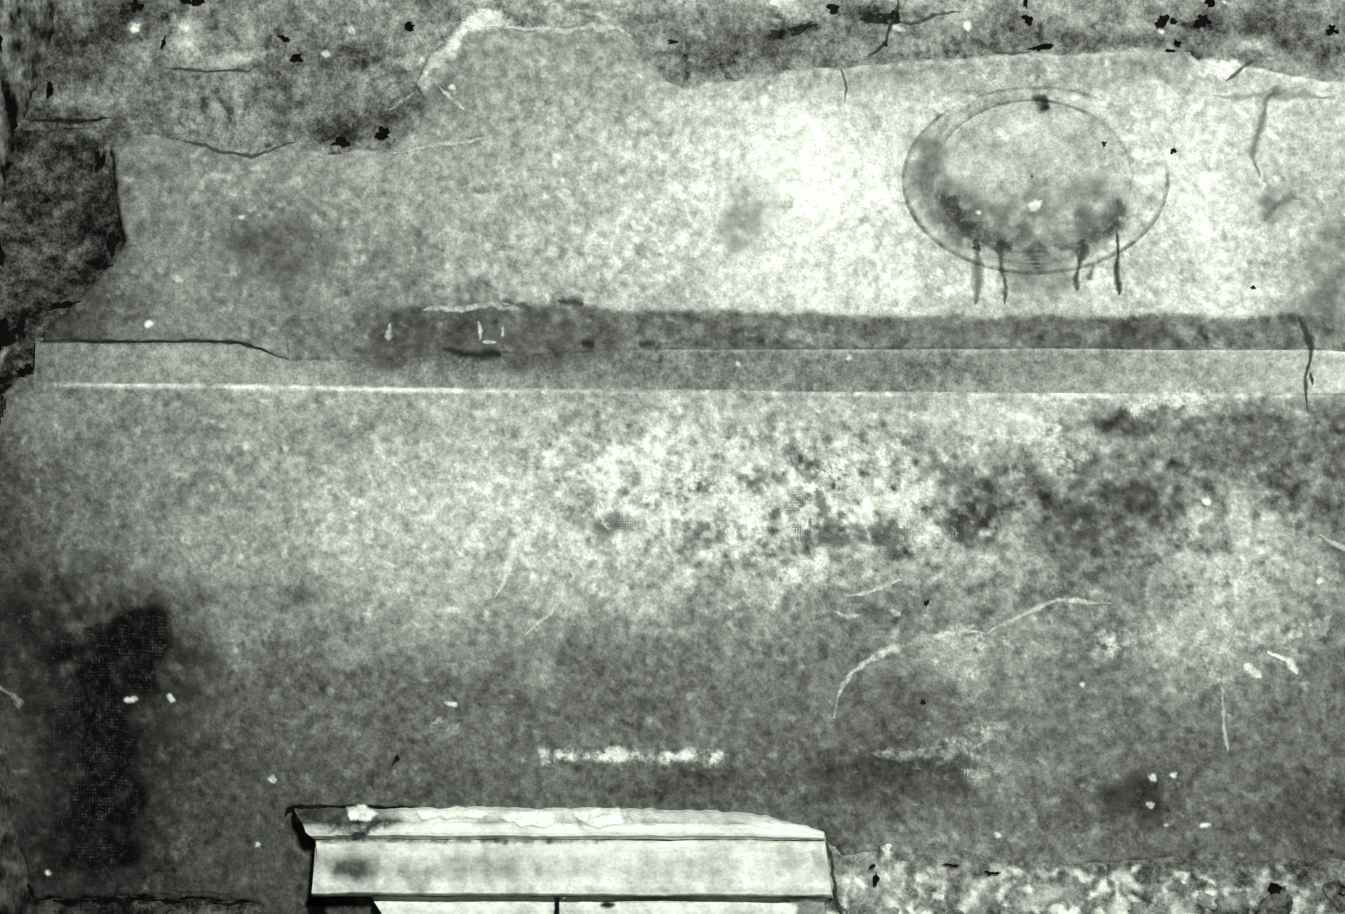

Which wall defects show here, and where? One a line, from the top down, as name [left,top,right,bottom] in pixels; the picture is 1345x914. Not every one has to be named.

spalling [0,0,1345,400]
water stain [946,196,1008,304]
water stain [1073,216,1122,295]
water stain [559,298,583,306]
water stain [443,348,501,358]
peeling [967,400,1090,469]
peeling [1126,388,1220,417]
crack [1298,317,1314,411]
water stain [0,562,216,905]
spalling [827,842,1345,914]